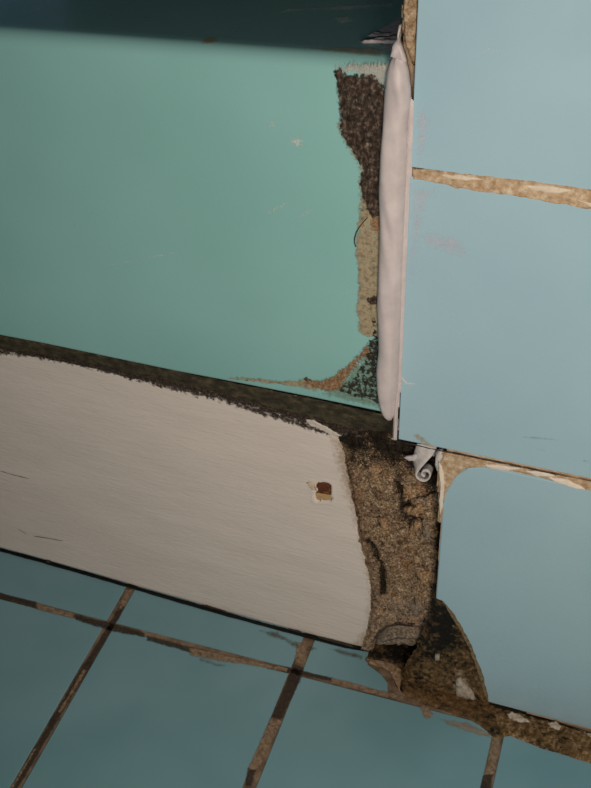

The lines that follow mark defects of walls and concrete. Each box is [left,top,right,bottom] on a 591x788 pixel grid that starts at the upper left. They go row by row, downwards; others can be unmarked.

water stain [0,63,398,461]
peeling [402,486,436,541]
spalling [365,570,508,741]